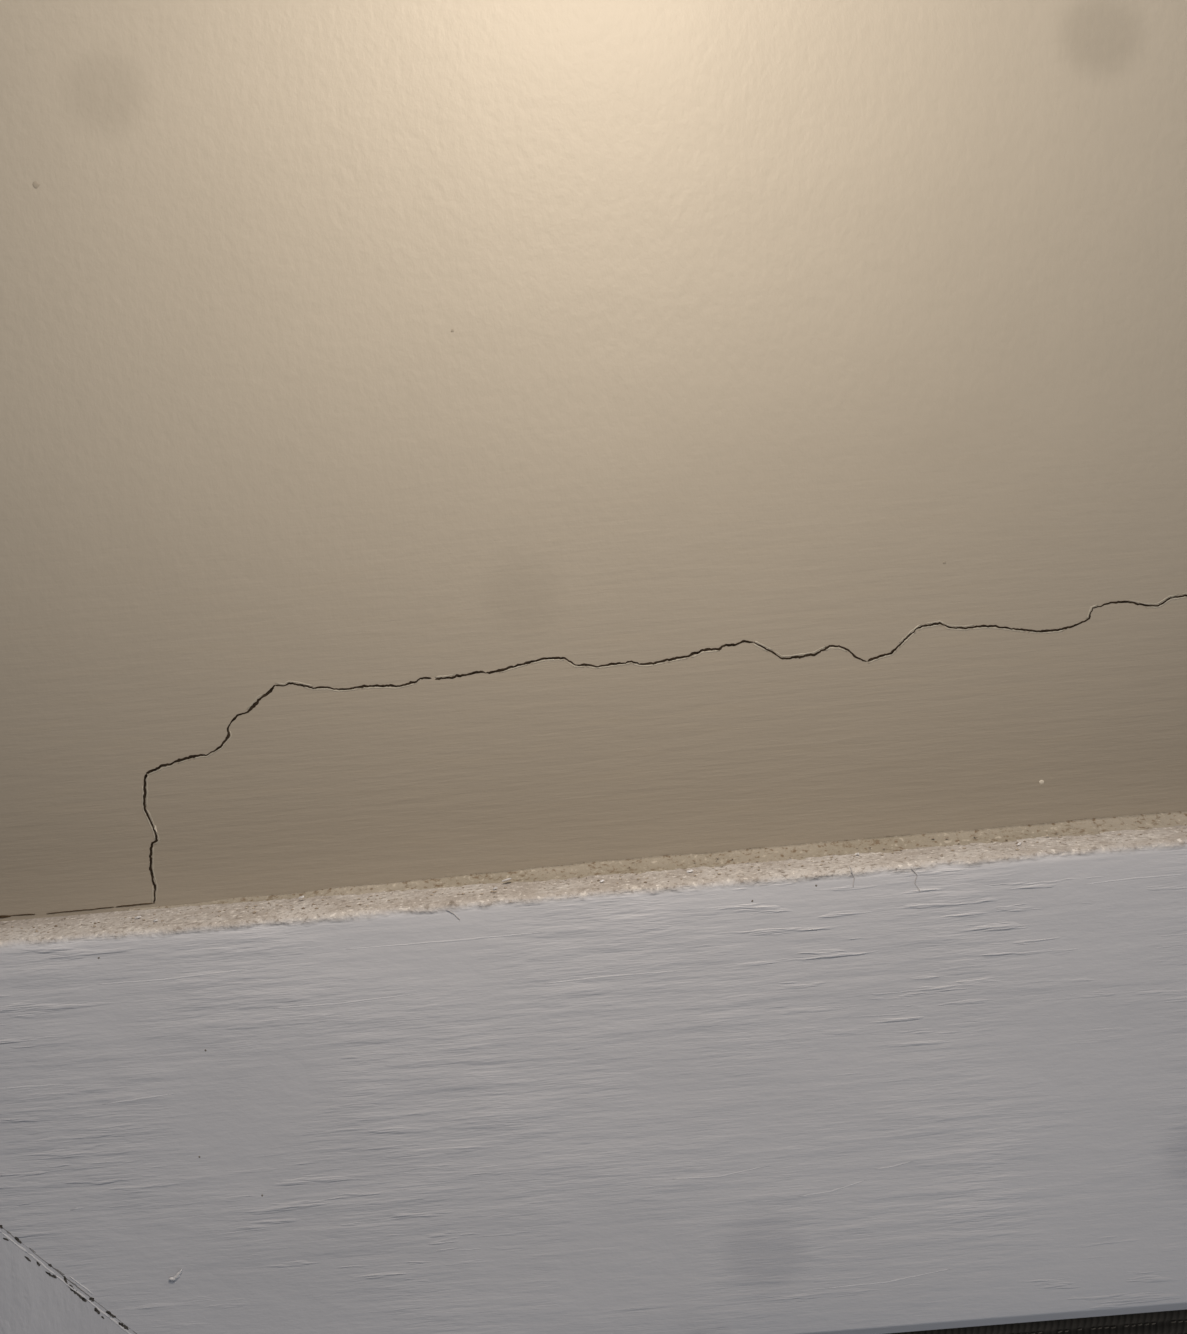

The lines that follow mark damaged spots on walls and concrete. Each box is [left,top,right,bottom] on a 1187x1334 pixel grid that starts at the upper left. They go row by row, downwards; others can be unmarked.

crack [142,593,1187,903]
crack [0,1225,137,1334]